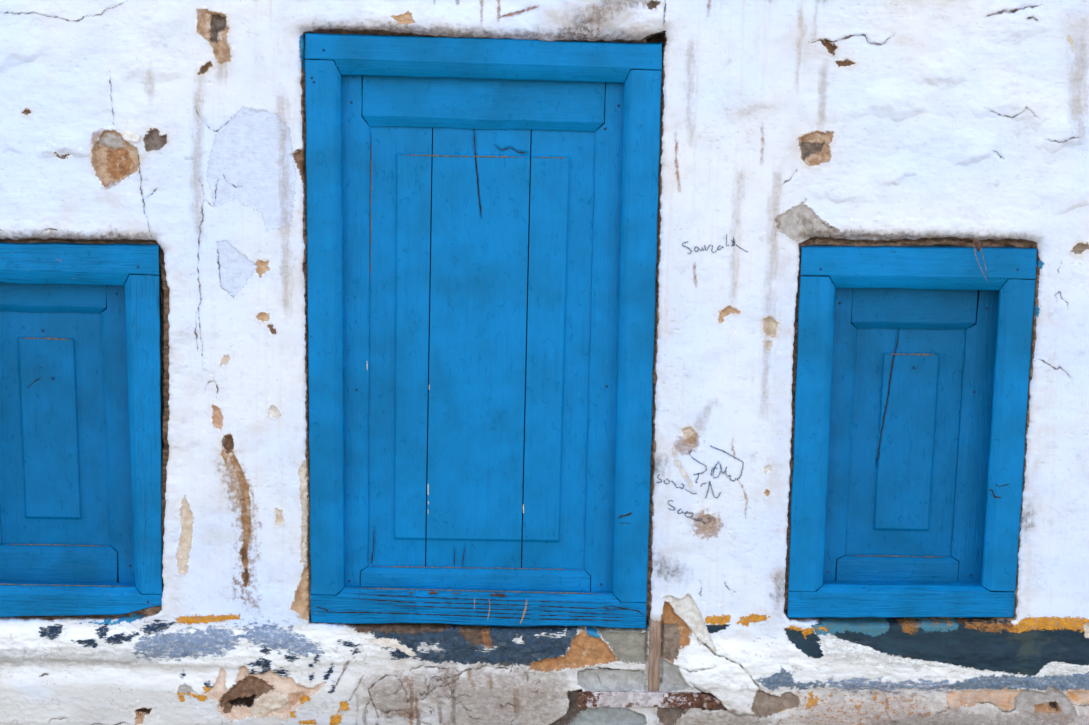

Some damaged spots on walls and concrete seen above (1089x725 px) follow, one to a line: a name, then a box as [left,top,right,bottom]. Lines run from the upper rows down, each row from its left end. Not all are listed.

flaking render [196,9,231,64]
flaking render [91,129,140,187]
flaking render [797,130,834,166]
crack [194,177,235,355]
flaking render [212,405,252,587]
peeling [897,617,959,636]
flaking render [177,664,335,725]
flaking render [751,689,800,720]
flaking render [1014,686,1078,725]